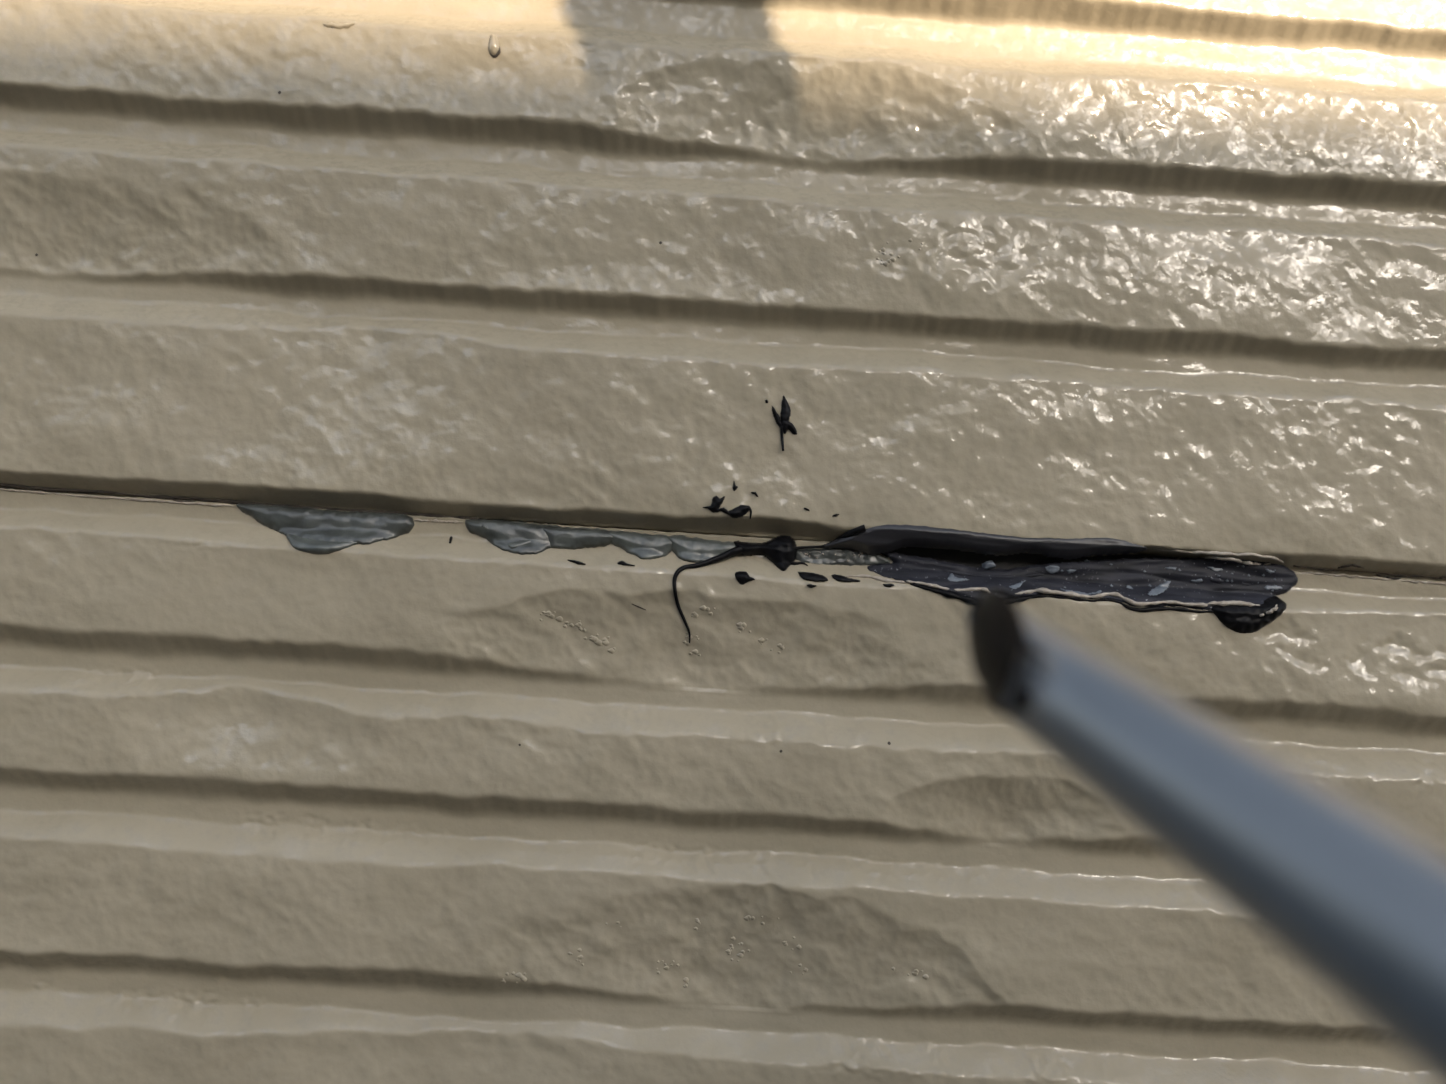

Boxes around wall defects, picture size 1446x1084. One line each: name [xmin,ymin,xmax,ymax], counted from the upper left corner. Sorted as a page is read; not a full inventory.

crack [1293,564,1446,585]